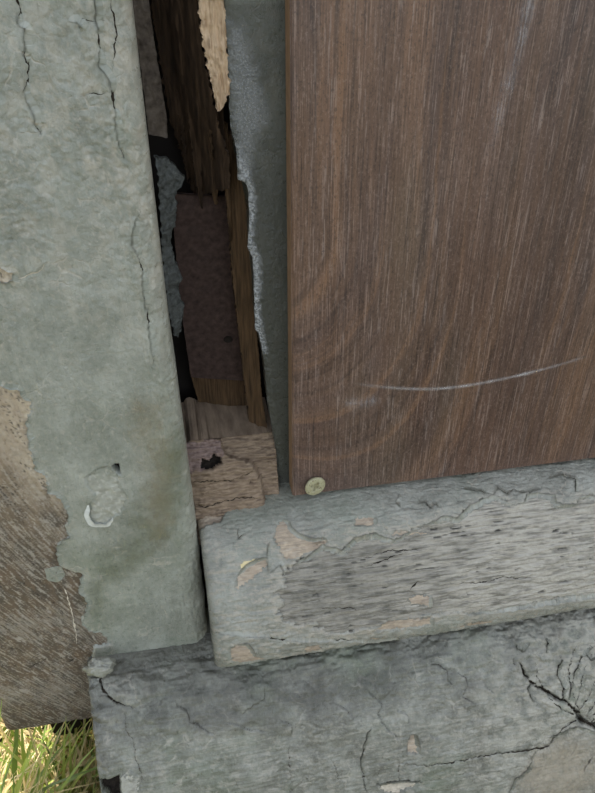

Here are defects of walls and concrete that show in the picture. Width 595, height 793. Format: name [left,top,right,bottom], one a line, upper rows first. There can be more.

crack [16,0,41,133]
crack [68,0,125,157]
peeling [0,381,112,730]
peeling [84,463,126,527]
peeling [236,557,268,589]
peeling [272,492,595,633]
peeling [121,771,140,793]
peeling [230,644,265,663]
crack [361,727,374,792]
crack [398,638,595,781]